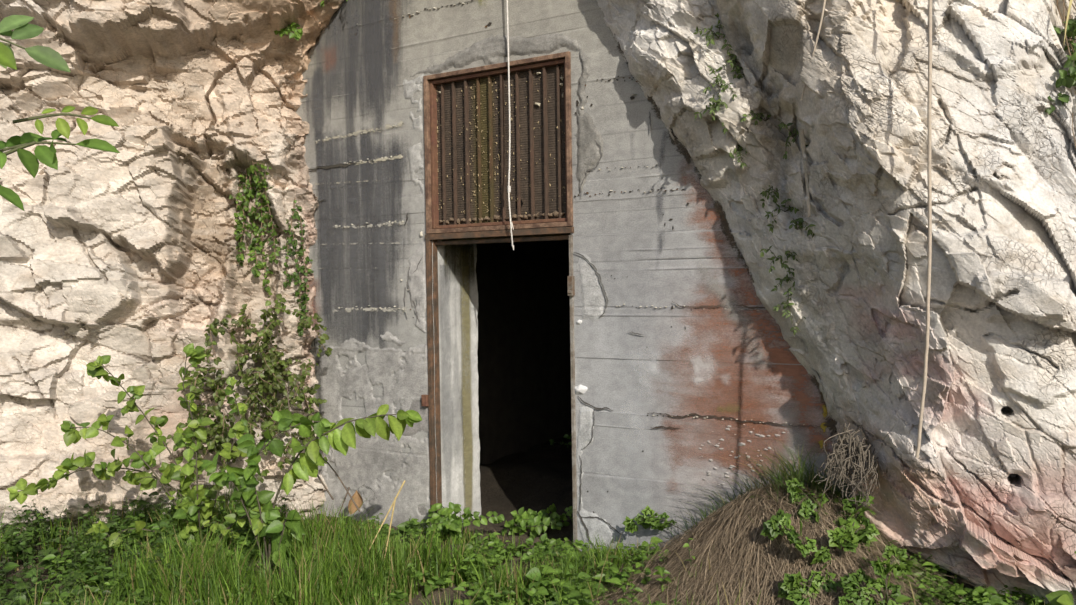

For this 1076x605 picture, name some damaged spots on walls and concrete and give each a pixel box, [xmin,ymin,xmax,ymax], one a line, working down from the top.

leakage [306,0,406,347]
crack [577,396,619,545]
crack [647,412,829,429]
corrosion [684,178,831,453]